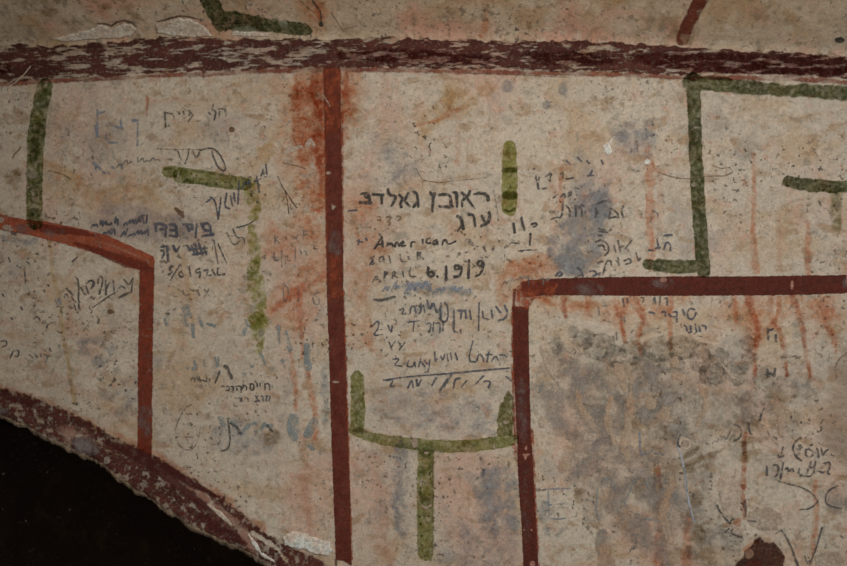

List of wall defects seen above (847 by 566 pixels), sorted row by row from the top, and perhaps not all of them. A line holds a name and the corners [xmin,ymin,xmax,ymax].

flaking render [207,503,232,526]
flaking render [247,533,275,562]
flaking render [282,531,333,556]